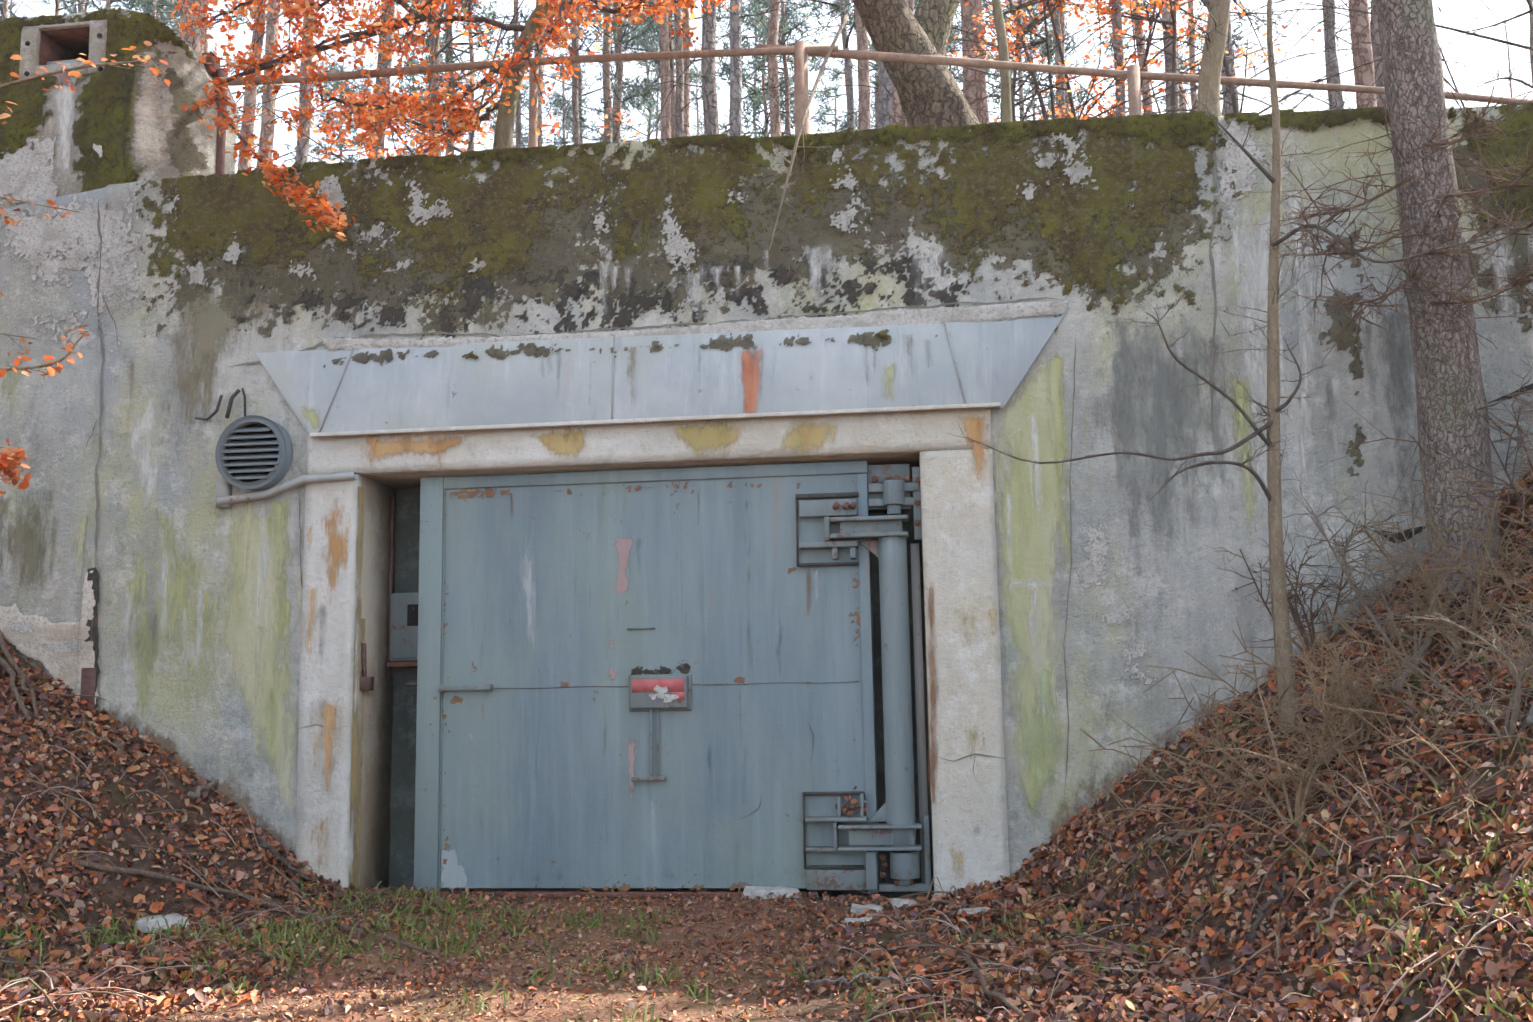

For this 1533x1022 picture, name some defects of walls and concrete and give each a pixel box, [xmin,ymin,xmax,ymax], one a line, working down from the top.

spalling [347,176,453,280]
spalling [656,198,699,274]
spalling [827,149,887,248]
rust [742,351,760,413]
leakage [1113,215,1284,524]
leakage [1288,191,1315,467]
leakage [131,401,158,495]
rust [362,436,462,459]
rust [675,423,739,452]
peeling [0,571,99,704]
leakage [125,519,216,705]
rust [308,486,365,888]